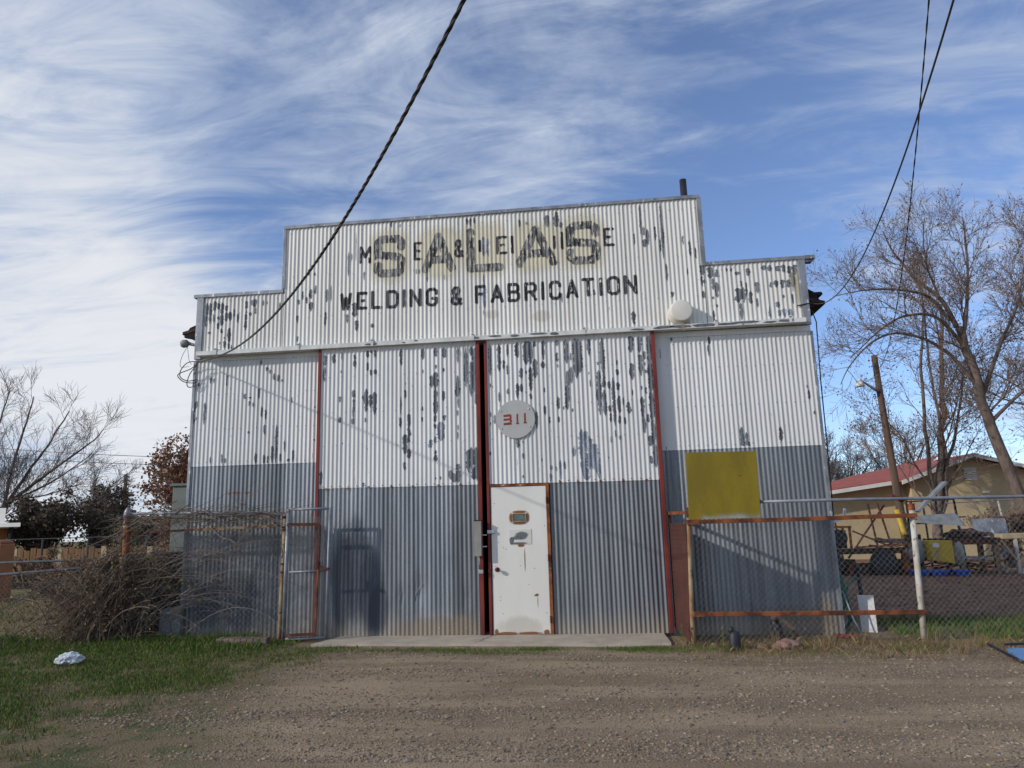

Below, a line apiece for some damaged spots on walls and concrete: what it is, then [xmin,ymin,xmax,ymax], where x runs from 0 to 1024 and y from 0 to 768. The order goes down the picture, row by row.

peeling [544,212,563,228]
peeling [633,202,674,297]
peeling [204,299,281,349]
peeling [296,269,332,326]
peeling [346,302,374,331]
peeling [323,342,377,381]
peeling [399,236,797,470]
peeling [243,388,294,464]
peeling [338,389,377,425]
peeling [435,447,491,483]
peeling [541,429,609,480]